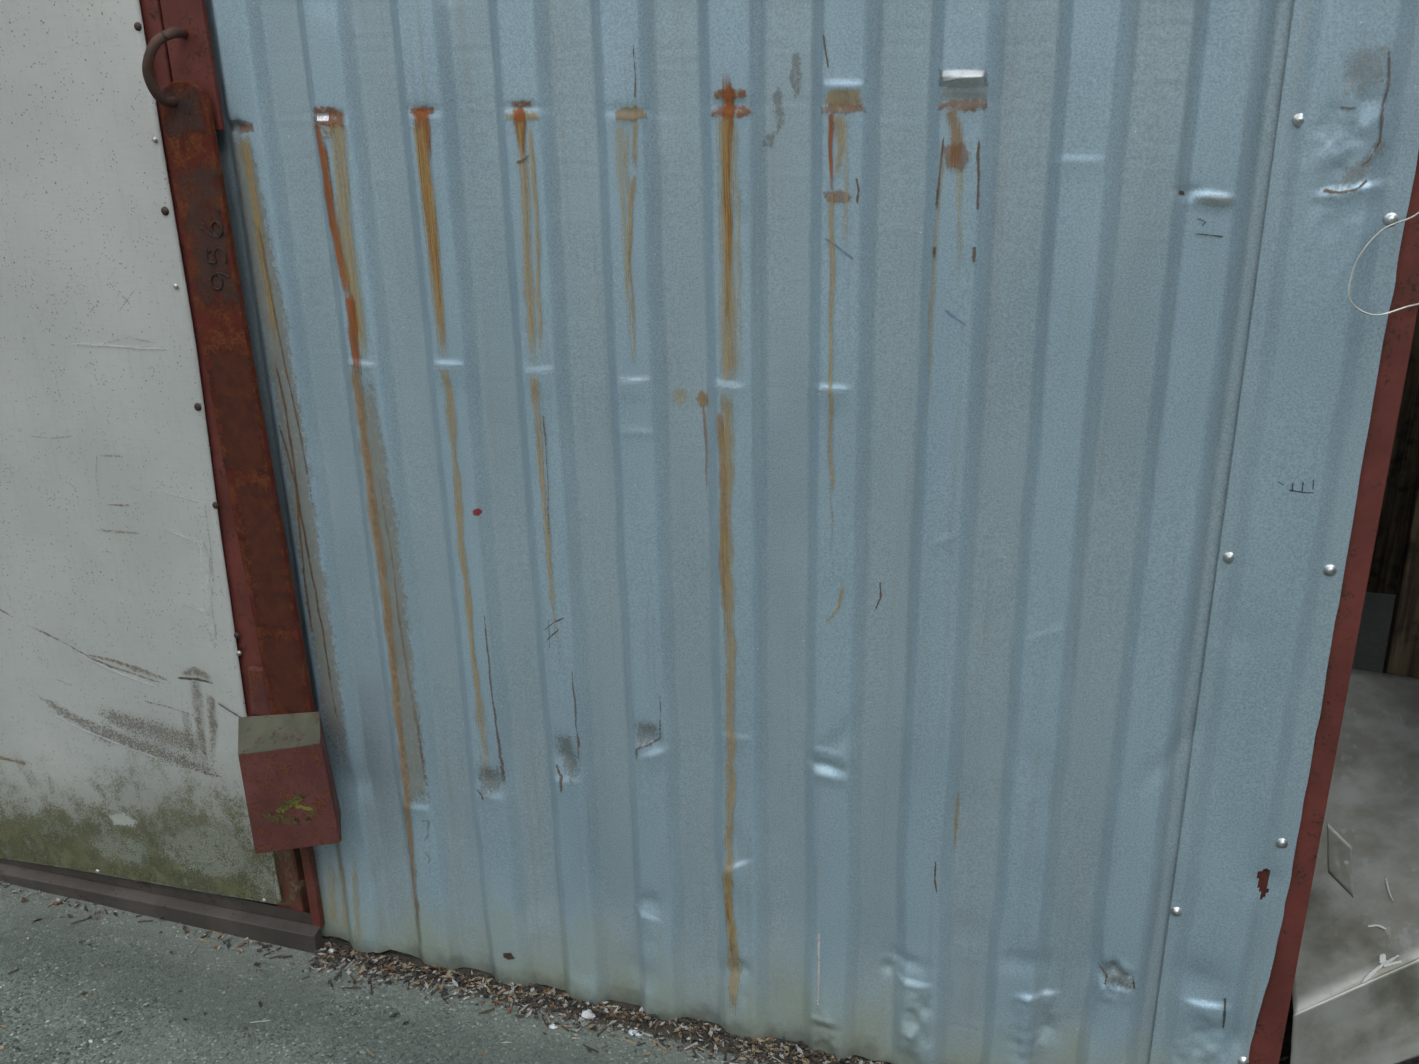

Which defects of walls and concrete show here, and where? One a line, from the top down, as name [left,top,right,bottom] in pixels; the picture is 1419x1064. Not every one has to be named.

rust [221,80,336,712]
rust [314,107,428,925]
rust [410,106,443,342]
rust [443,374,505,781]
rust [506,100,542,342]
rust [532,380,554,610]
rust [572,673,580,759]
rust [615,47,647,272]
rust [699,392,735,947]
rust [711,82,750,377]
rust [822,89,864,441]
rust [936,99,987,210]